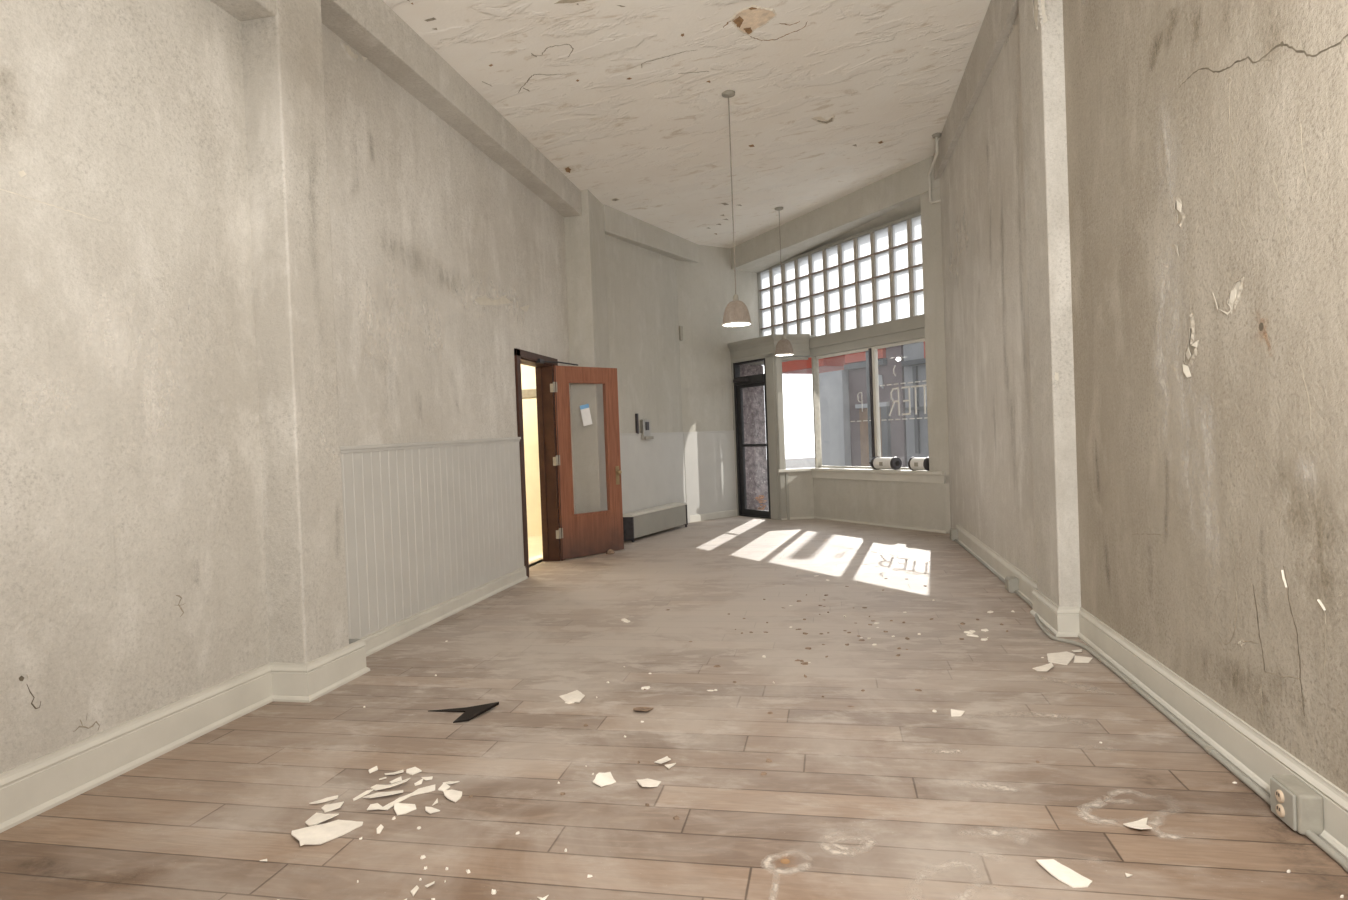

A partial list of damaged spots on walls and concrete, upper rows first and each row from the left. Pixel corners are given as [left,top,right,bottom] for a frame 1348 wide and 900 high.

flaking render [723,5,807,41]
crack [1180,34,1348,236]
peeling [1213,277,1244,315]
peeling [1183,313,1199,378]
crack [1241,566,1327,718]